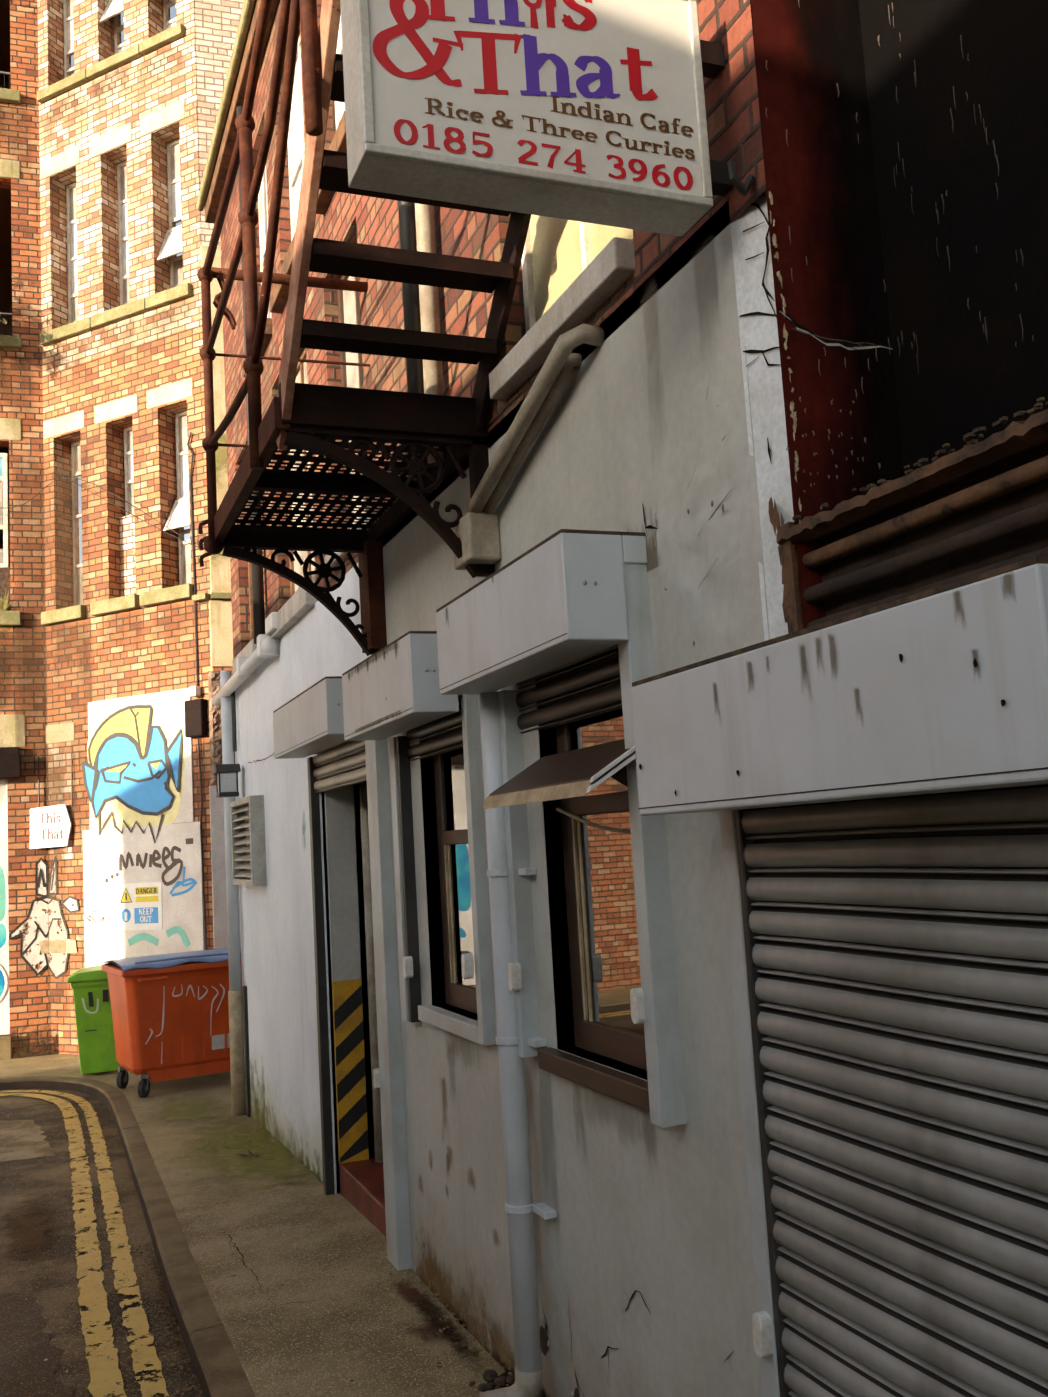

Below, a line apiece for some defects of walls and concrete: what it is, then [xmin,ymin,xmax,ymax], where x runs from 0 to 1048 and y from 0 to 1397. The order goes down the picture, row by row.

peeling [768,191,802,624]
damp [398,1252,515,1375]
crack [568,1303,619,1396]
crack [625,1290,651,1314]